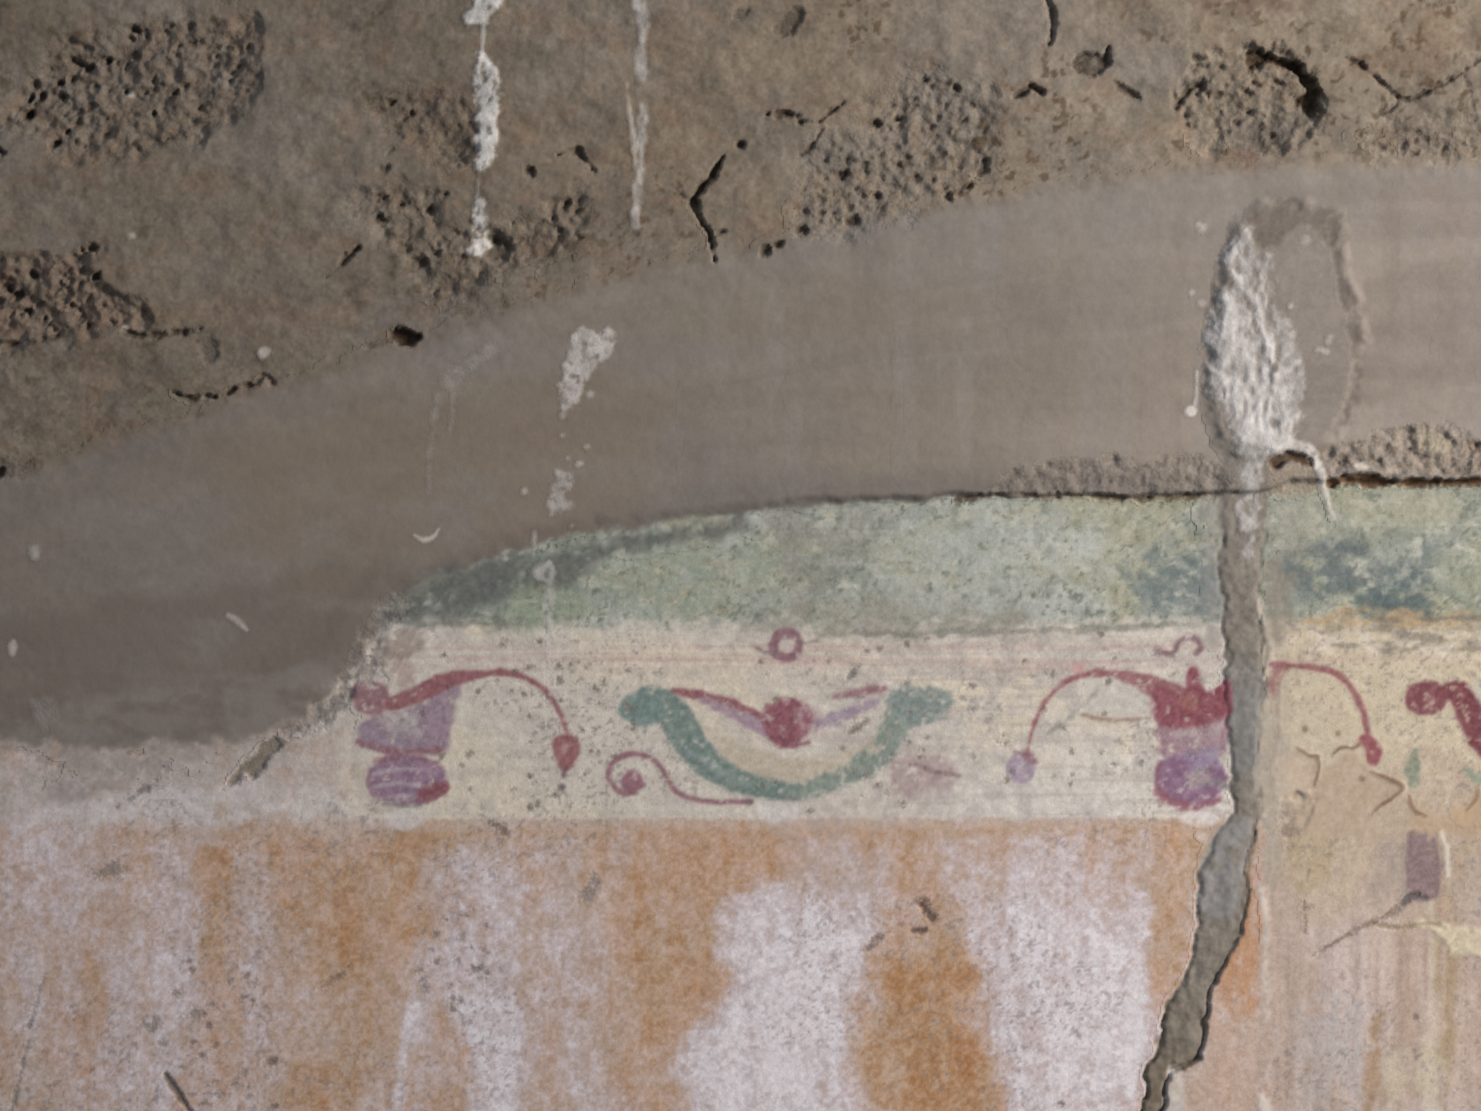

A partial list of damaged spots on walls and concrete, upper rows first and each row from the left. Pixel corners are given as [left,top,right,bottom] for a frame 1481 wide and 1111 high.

spalling [0,236,204,360]
spalling [0,0,266,170]
spalling [341,80,595,313]
damp [460,0,507,259]
damp [389,325,767,708]
damp [623,0,652,232]
spalling [757,58,1008,259]
damp [1181,219,1337,566]
spalling [1168,37,1481,172]
spalling [1264,419,1481,501]
damp [744,748,979,906]
crack [952,454,1481,1111]